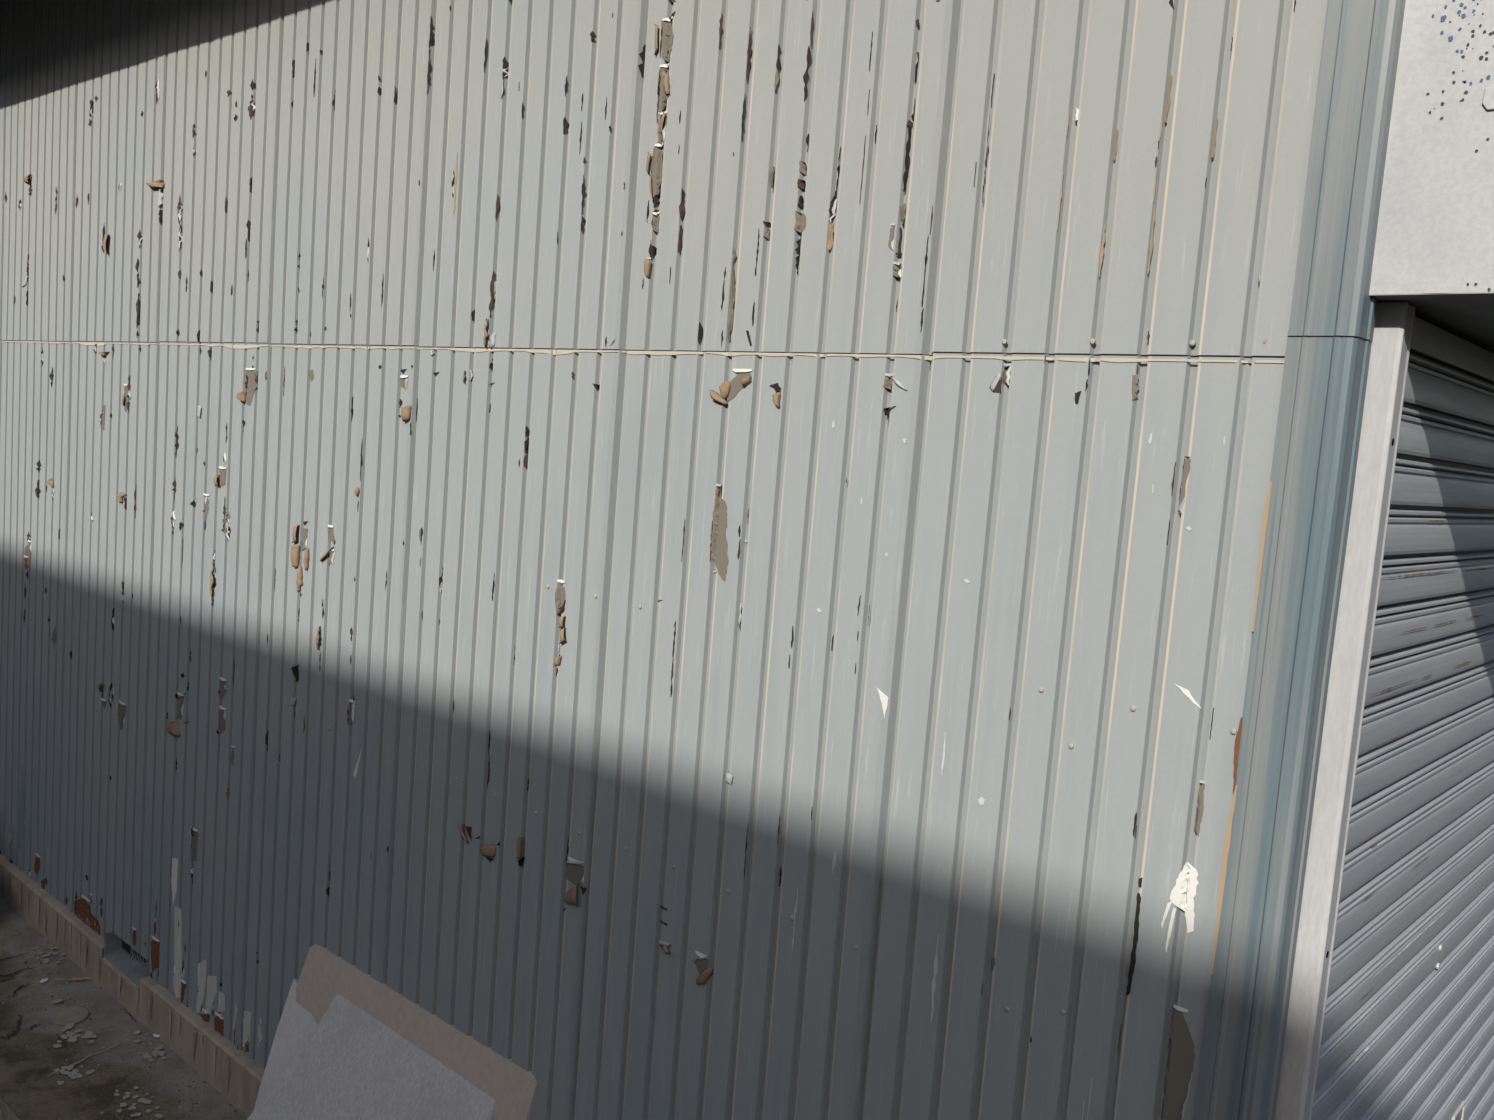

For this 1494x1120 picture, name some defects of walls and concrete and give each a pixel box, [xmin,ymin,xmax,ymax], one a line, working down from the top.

peeling [651,12,675,232]
peeling [242,359,258,431]
peeling [710,484,748,581]
peeling [555,579,566,614]
peeling [566,855,585,885]
rust [75,896,103,935]
peeling [1160,1004,1195,1120]